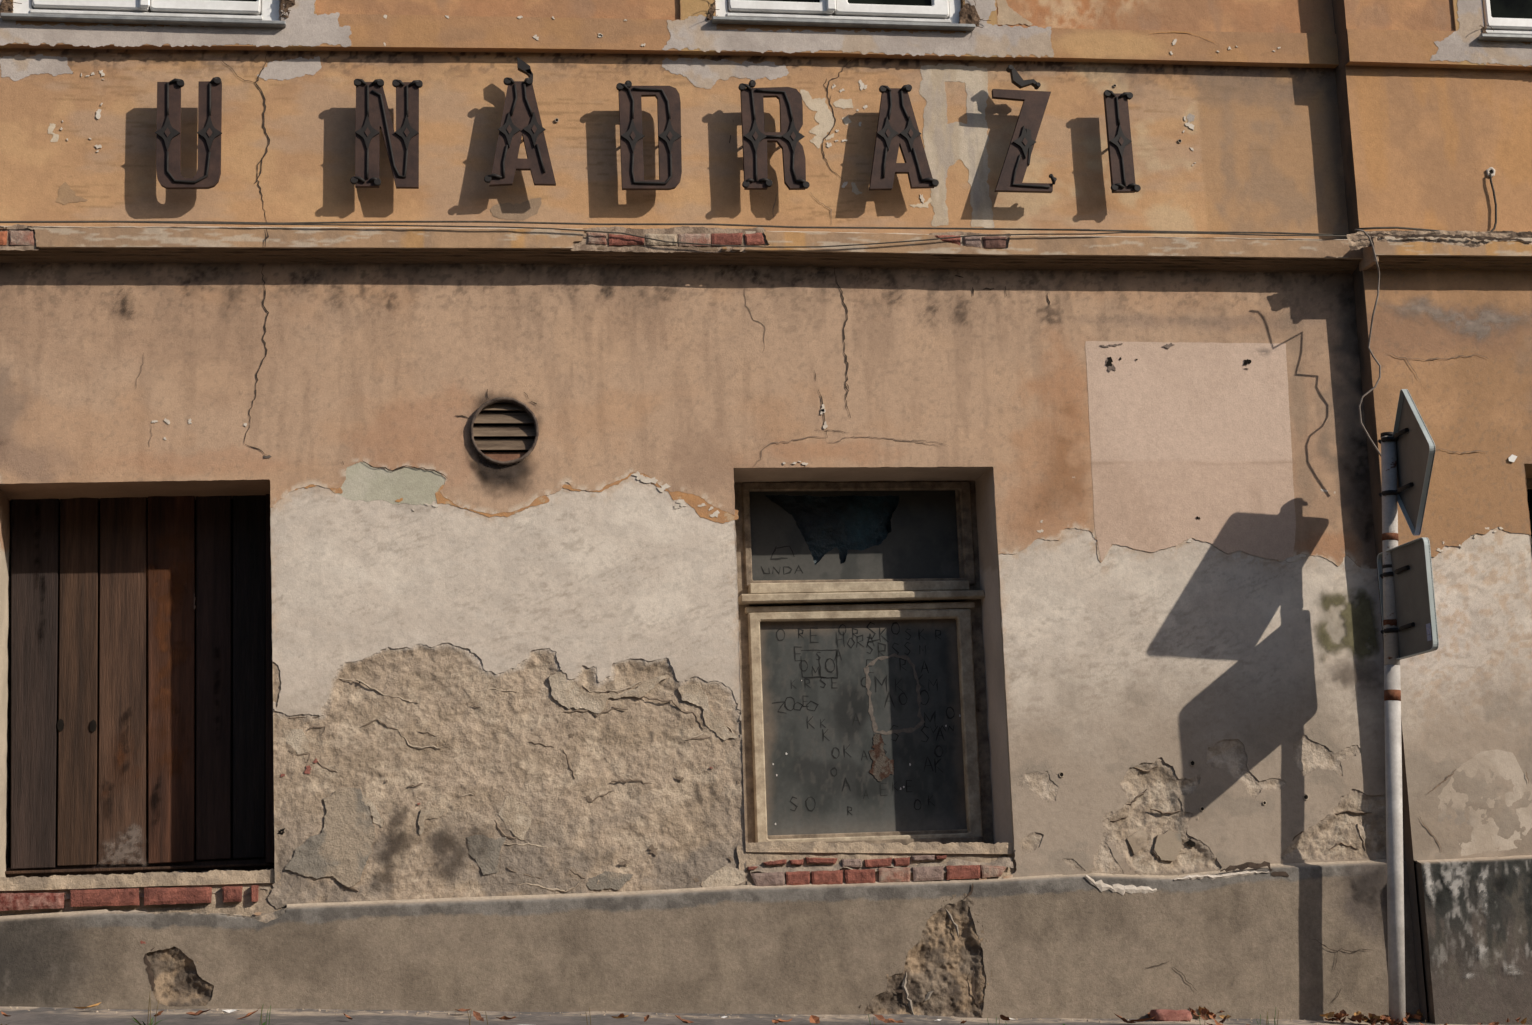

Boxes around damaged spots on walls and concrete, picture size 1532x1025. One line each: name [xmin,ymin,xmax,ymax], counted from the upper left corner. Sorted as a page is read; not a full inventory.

flaking render [0,0,22,13]
flaking render [279,0,295,18]
crack [223,54,272,458]
crack [744,288,766,353]
crack [754,267,949,466]
water stain [1318,590,1379,682]
flaking render [0,462,1532,1018]
water stain [1425,867,1518,901]